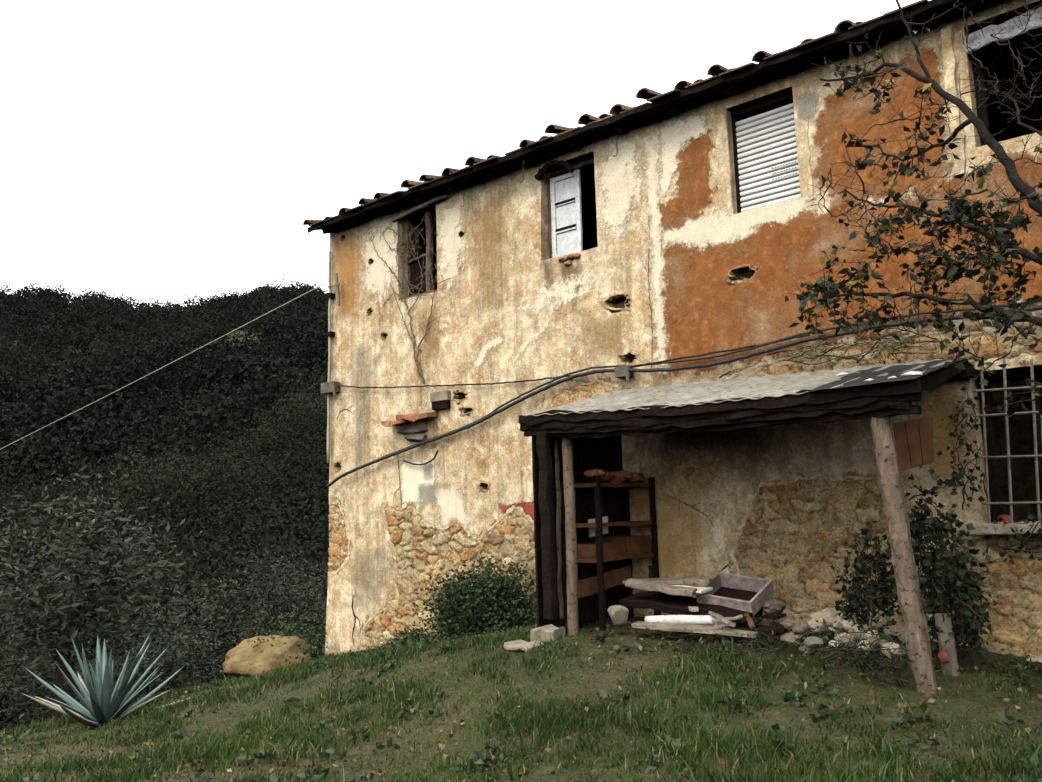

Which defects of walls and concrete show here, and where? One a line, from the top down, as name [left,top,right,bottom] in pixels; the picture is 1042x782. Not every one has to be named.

peeling [642,42,1042,380]
spalling [600,290,631,311]
spalling [617,348,640,366]
spalling [328,497,352,575]
spalling [354,502,537,651]
spalling [726,469,898,620]